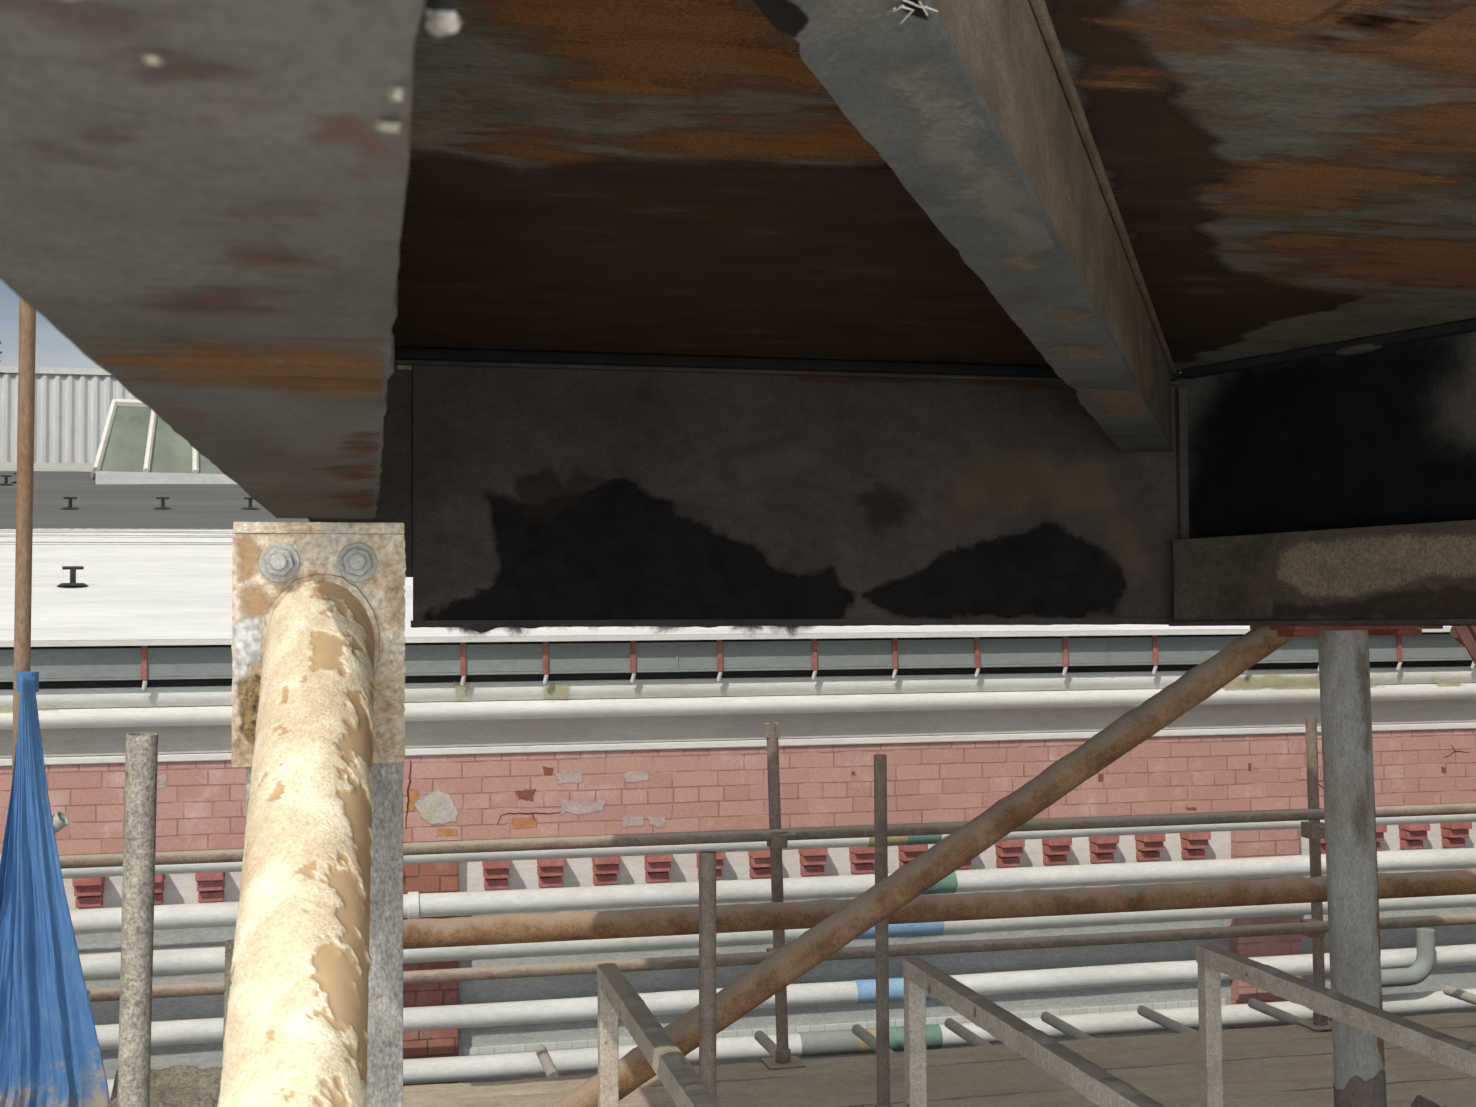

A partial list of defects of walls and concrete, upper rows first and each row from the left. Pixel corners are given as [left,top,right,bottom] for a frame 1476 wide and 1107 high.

rust [455,0,886,165]
water stain [1045,0,1362,362]
rust [238,536,268,619]
rust [236,674,261,744]